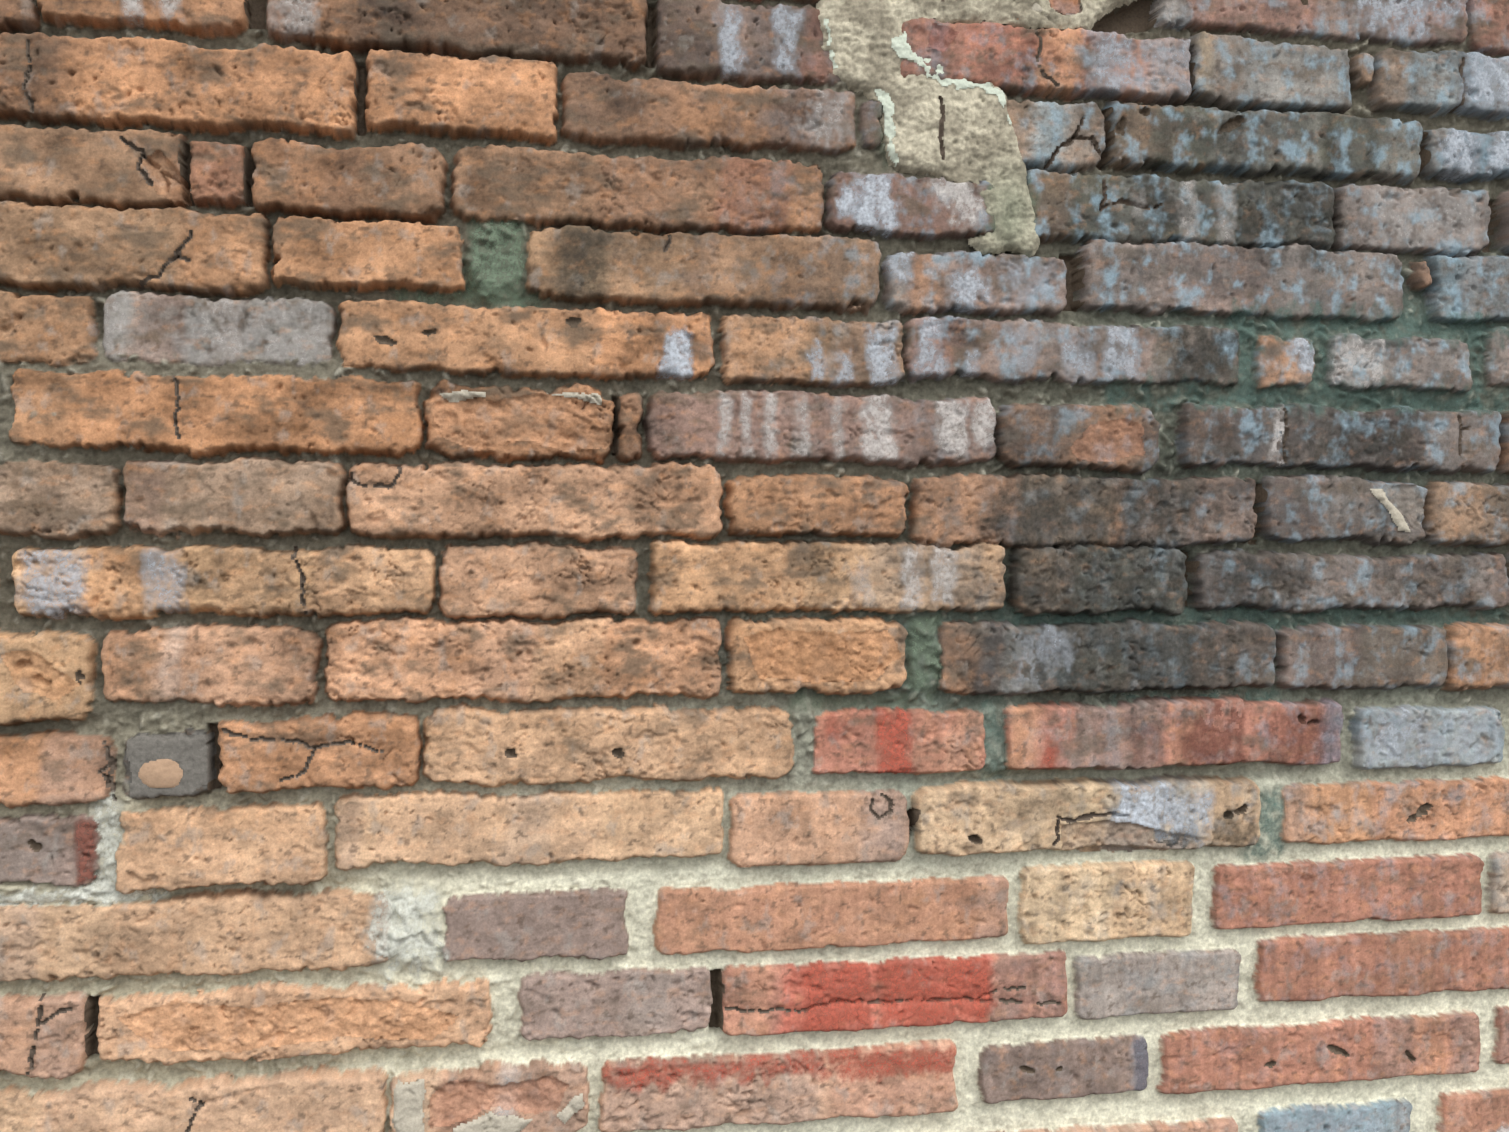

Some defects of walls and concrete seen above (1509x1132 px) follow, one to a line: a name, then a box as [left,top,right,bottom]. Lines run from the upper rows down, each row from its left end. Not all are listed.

crack [119,136,154,186]
flaking render [816,0,1192,258]
water stain [1443,129,1509,181]
water stain [836,174,898,238]
water stain [933,182,982,223]
crack [139,230,193,291]
water stain [1293,338,1314,372]
water stain [861,329,897,460]
water stain [937,400,995,456]
crack [221,728,384,782]
crack [1052,811,1130,846]
crack [26,993,73,1075]